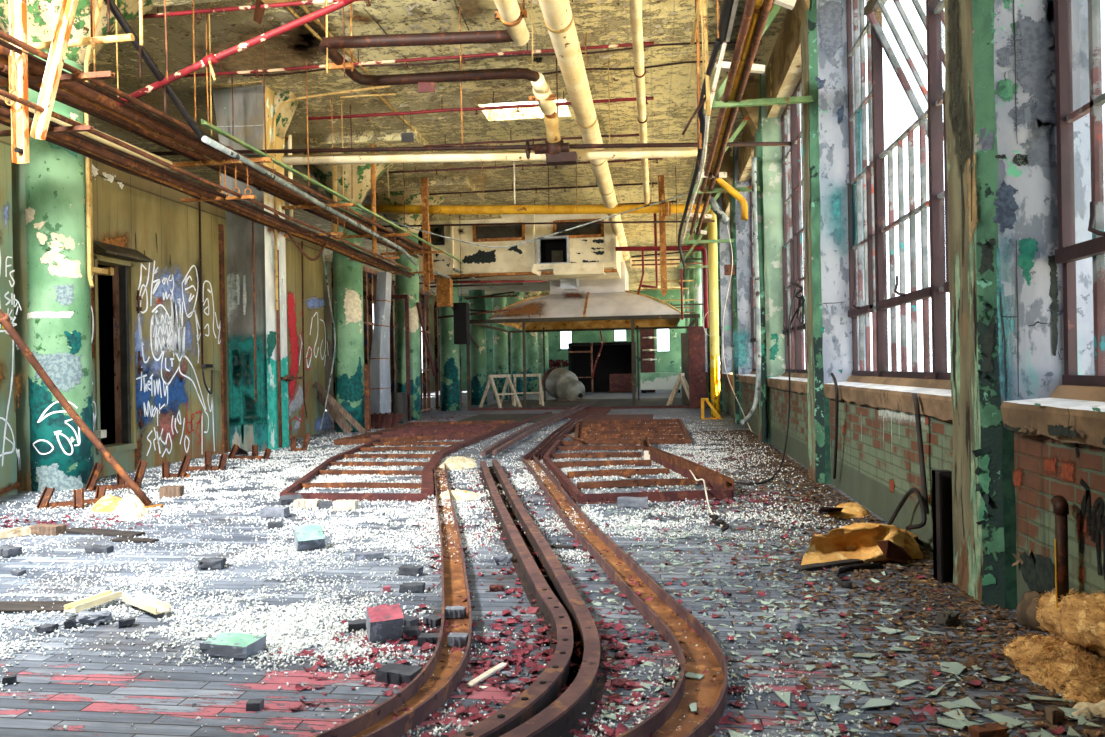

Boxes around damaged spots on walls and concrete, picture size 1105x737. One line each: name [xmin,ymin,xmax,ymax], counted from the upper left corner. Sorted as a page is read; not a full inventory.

peeling [570,0,721,144]
peeling [90,0,603,205]
spalling [966,0,1057,286]
rust [101,234,128,248]
peeling [21,207,84,428]
peeling [343,288,362,325]
spalling [977,295,996,379]
peeling [337,357,363,402]
peeling [444,357,459,383]
spalling [1047,424,1084,438]
flaking render [1013,469,1023,488]
spalling [1012,549,1056,595]